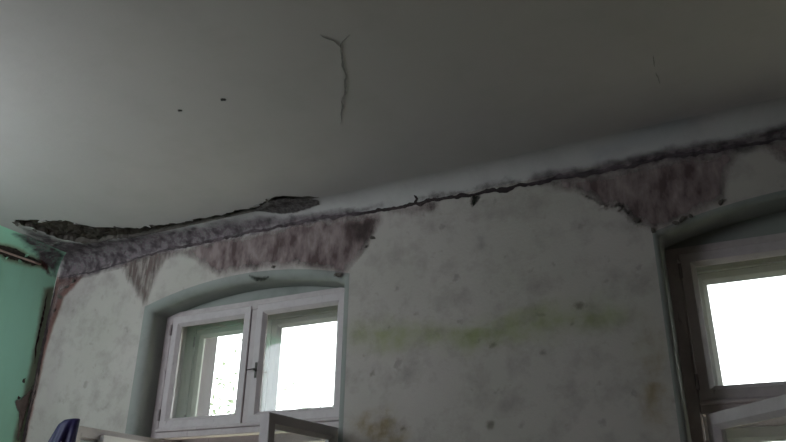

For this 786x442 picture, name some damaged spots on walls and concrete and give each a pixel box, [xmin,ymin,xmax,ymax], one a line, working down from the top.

crack [321,35,347,122]
spalling [12,196,319,245]
peeling [189,216,379,282]
crack [128,161,653,263]
crack [21,277,59,442]